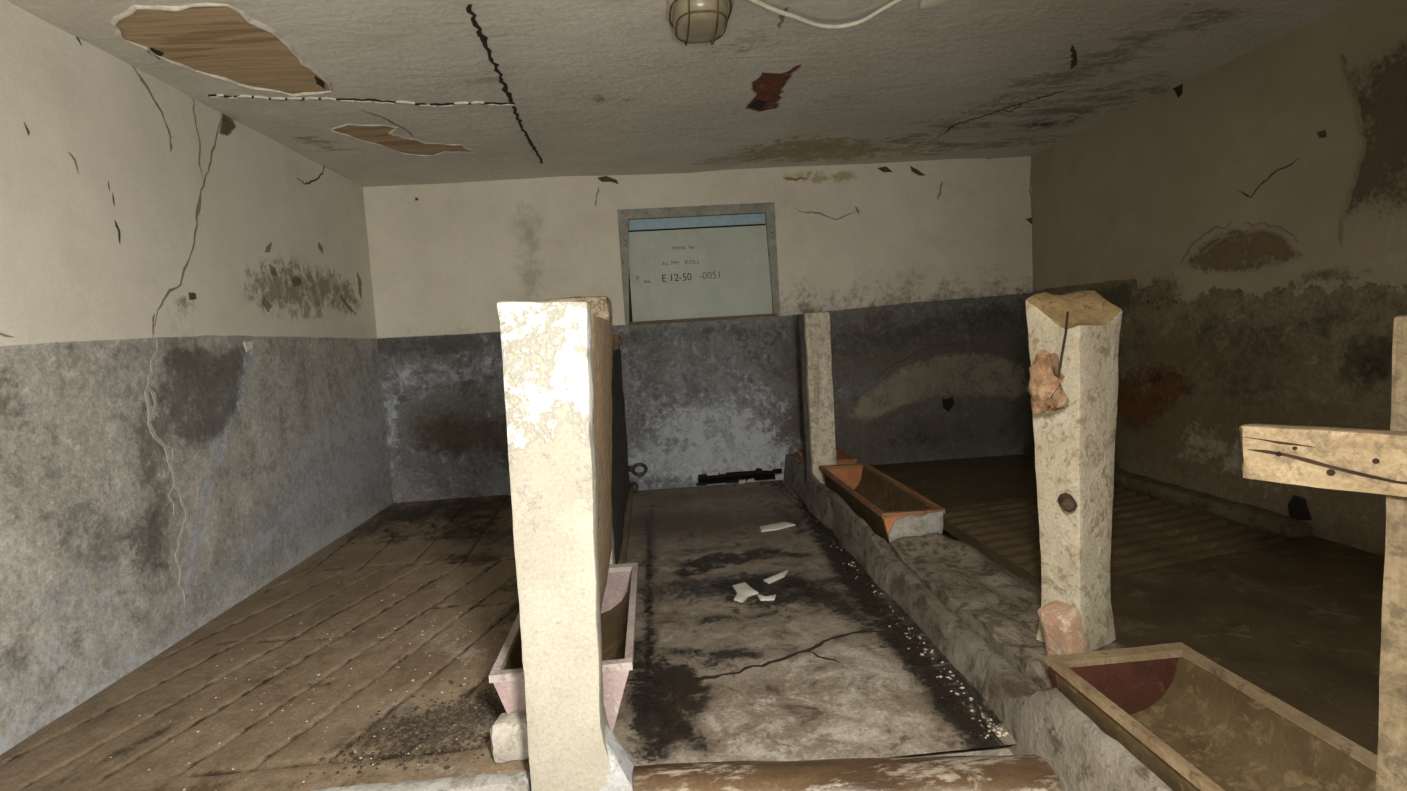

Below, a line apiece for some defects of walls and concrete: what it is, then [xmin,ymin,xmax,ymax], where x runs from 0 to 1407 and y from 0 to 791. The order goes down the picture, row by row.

flaking render [111,3,333,97]
flaking render [744,63,801,112]
flaking render [330,124,474,156]
crack [1239,159,1298,198]
leakage [249,242,362,315]
crack [132,4,543,604]
rust [1117,365,1190,429]
leakage [160,341,395,610]
crack [699,630,895,680]